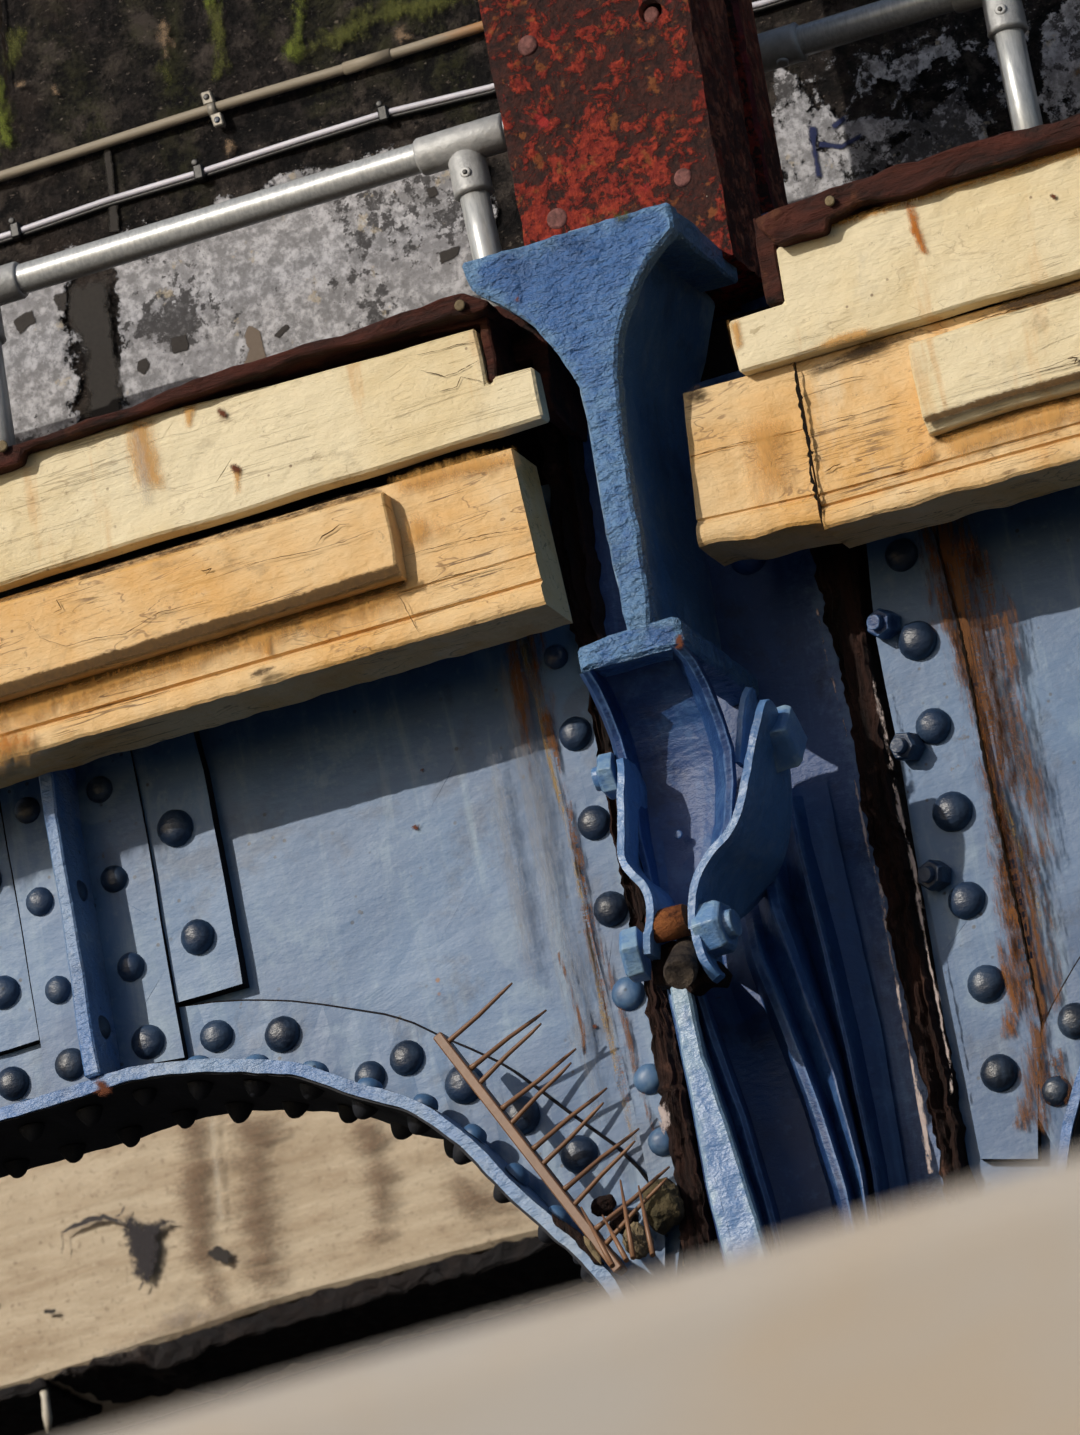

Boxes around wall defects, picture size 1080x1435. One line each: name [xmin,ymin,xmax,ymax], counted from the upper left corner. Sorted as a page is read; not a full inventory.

peeling [0,281,86,444]
damp [104,147,119,232]
peeling [261,164,329,190]
peeling [112,169,481,410]
crack [687,362,907,530]
peeling [772,26,1008,204]
corrosion [753,113,1080,308]
peeling [1024,0,1080,123]
corrosion [918,517,1074,1132]
corrosion [503,632,722,1266]
damp [178,1116,283,1303]